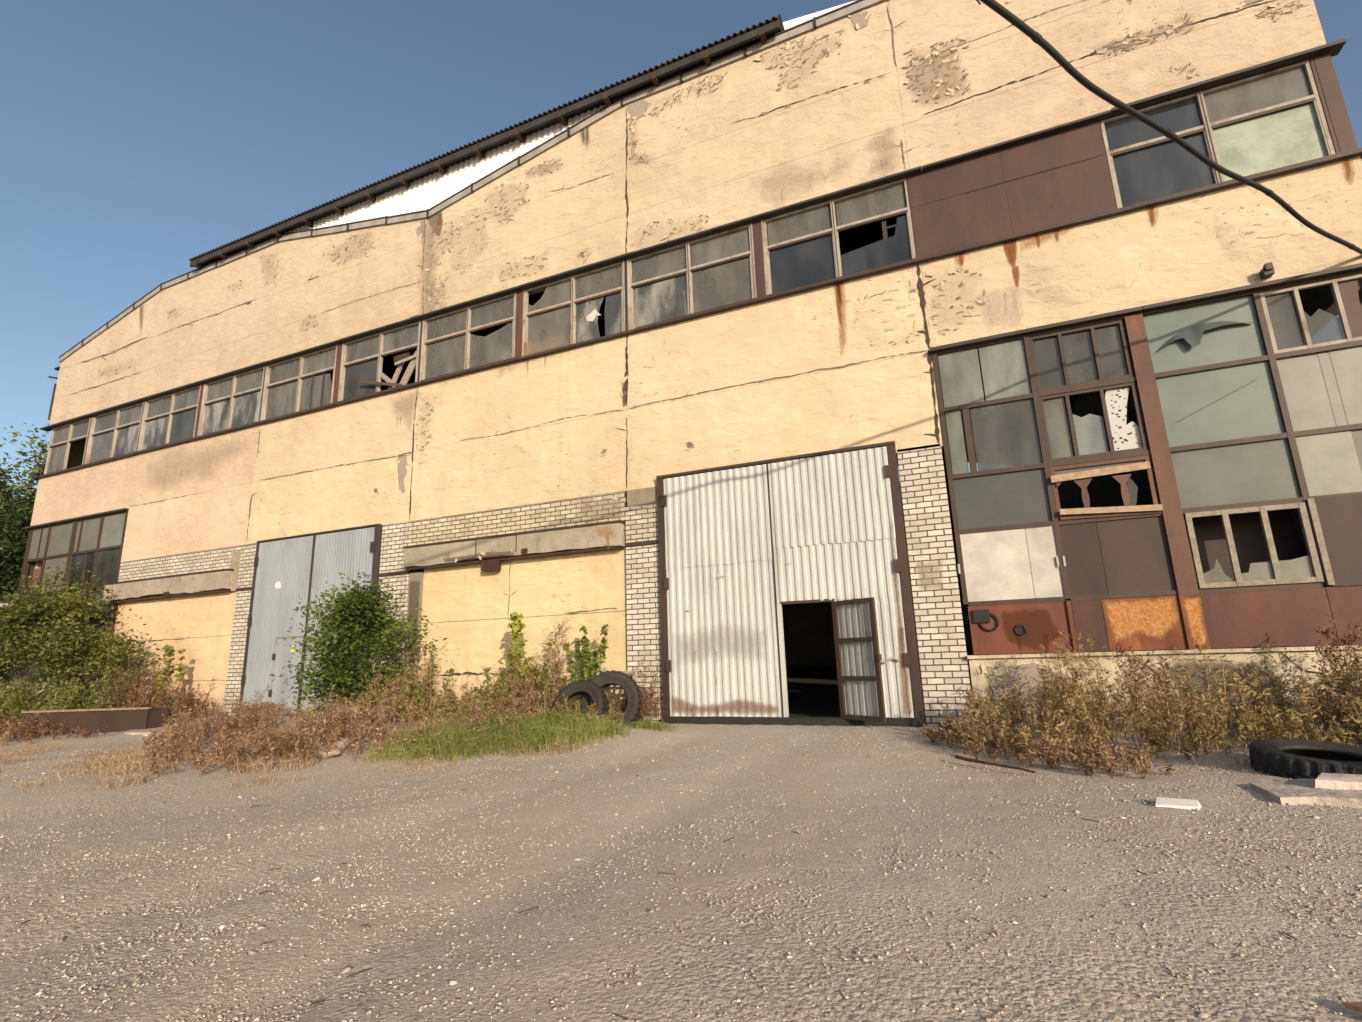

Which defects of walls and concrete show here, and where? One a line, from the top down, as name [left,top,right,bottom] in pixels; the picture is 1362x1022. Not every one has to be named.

peeling [1237,0,1307,22]
peeling [753,9,871,91]
crack [734,0,1085,123]
peeling [902,34,971,103]
crack [924,0,1274,115]
spalling [627,72,727,164]
corrosion [1004,240,1019,286]
peeling [925,267,986,335]
corrosion [1003,611,1060,650]
corrosion [1105,598,1206,647]